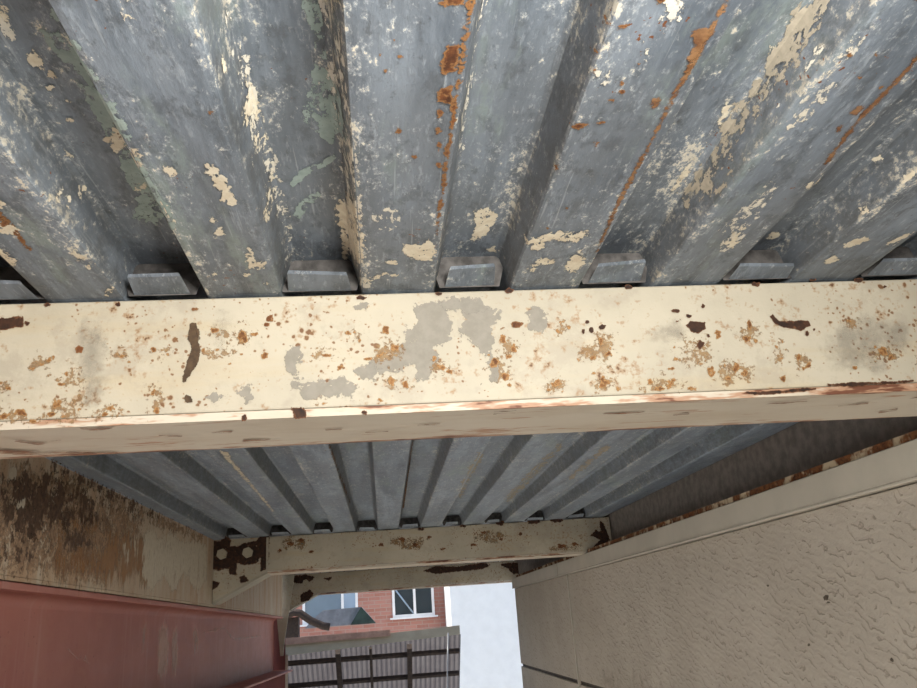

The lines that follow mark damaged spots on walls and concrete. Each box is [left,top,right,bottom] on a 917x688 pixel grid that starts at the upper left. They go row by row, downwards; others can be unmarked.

peeling [658,0,685,22]
peeling [671,0,830,210]
peeling [222,0,437,288]
peeling [204,163,237,206]
peeling [524,230,589,273]
rust [0,315,30,330]
rust [0,350,123,428]
rust [182,314,273,382]
peeling [284,295,502,401]
rust [577,320,621,396]
rust [638,309,816,396]
rust [212,536,315,590]